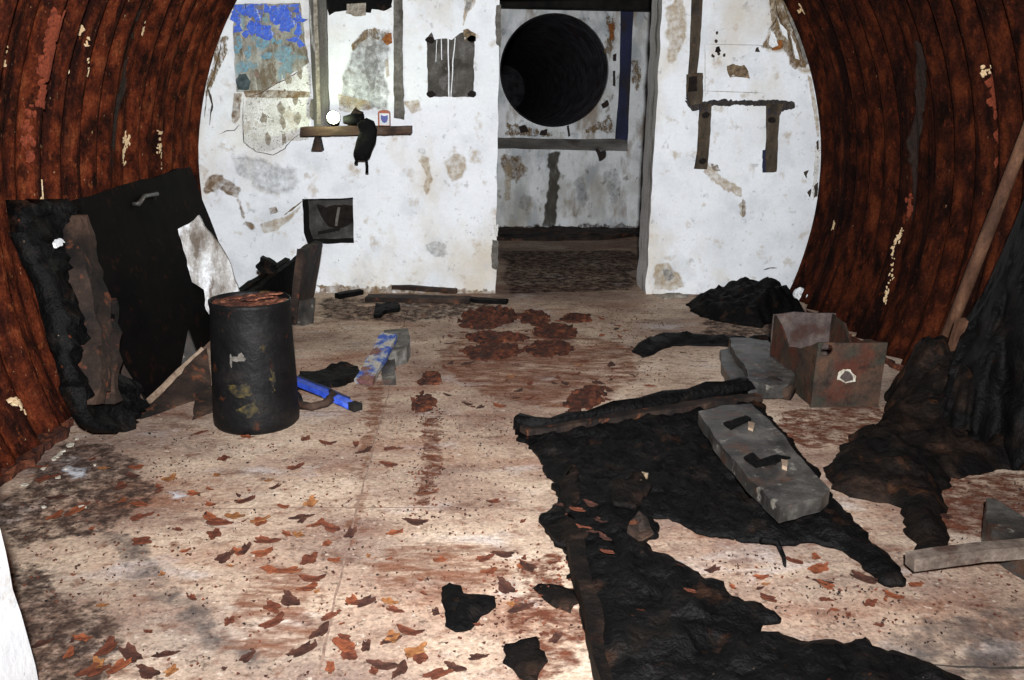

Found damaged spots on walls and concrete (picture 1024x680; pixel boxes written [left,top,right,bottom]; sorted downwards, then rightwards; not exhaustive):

peeling [230,3,314,155]
flaking render [711,31,750,79]
damp [526,152,560,228]
peeling [883,193,913,304]